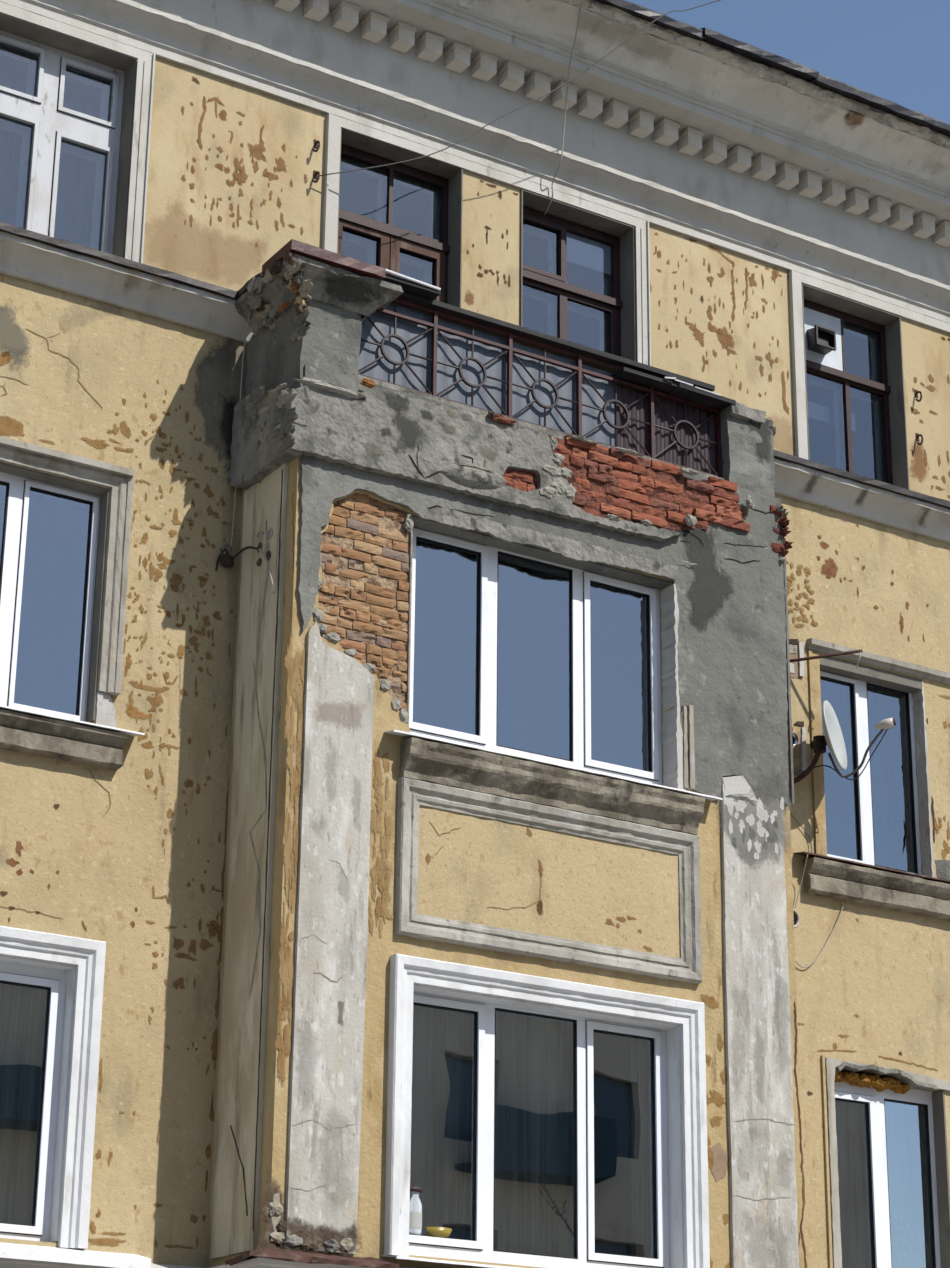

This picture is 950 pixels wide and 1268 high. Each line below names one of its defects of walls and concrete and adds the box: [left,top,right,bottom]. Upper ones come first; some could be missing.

peeling [181,77,308,246]
damp [0,307,28,364]
peeling [650,232,789,414]
spalling [502,435,756,533]
peeling [81,380,237,799]
spalling [313,492,414,723]
damp [681,526,733,630]
spalling [770,505,859,678]
peeling [722,780,790,864]
peeling [131,776,229,1075]
spalling [257,1180,361,1257]
crack [734,1002,807,1268]